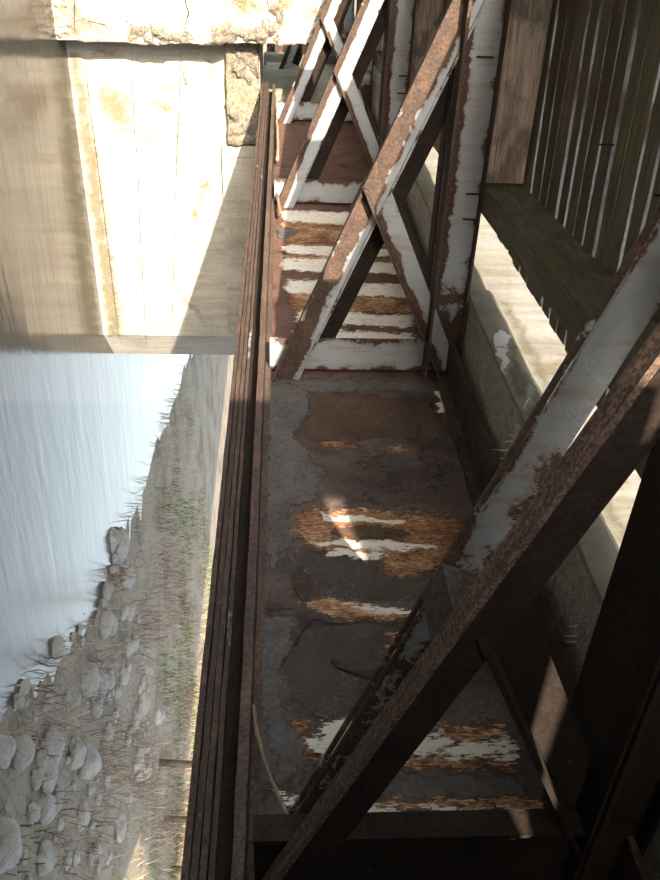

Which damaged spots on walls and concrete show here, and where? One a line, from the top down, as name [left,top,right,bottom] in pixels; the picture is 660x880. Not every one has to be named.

crack [71,0,183,341]
peeling [282,210,349,225]
peeling [280,244,333,295]
peeling [357,249,409,299]
peeling [336,311,416,339]
peeling [319,511,406,524]
peeling [317,538,437,560]
rust [255,378,472,801]
peeling [306,716,352,757]
rust [374,721,544,811]
peeling [410,727,524,769]
peeling [368,798,521,812]